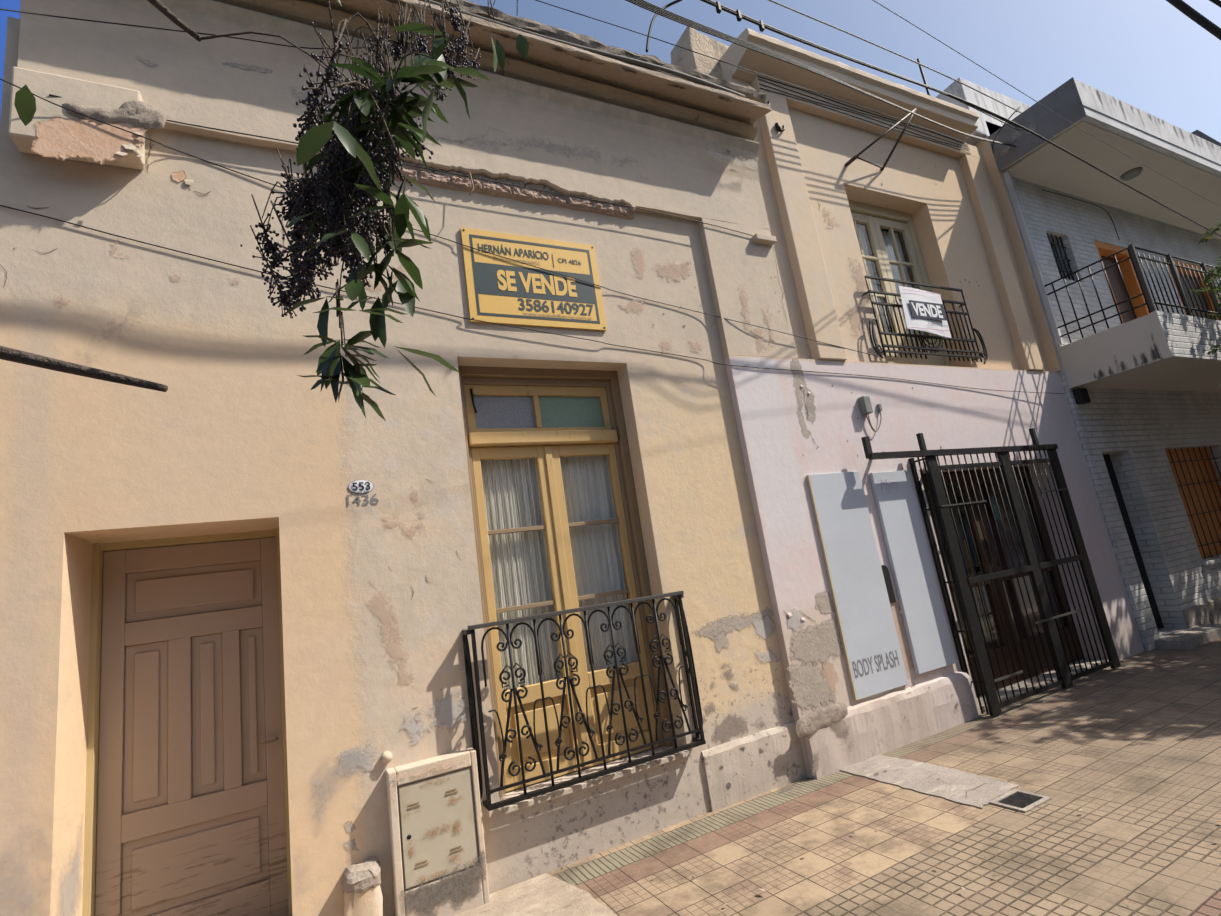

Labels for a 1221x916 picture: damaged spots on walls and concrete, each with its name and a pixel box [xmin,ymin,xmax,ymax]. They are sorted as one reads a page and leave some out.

peeling [32,100,169,164]
spalling [395,159,634,219]
peeling [790,358,816,438]
peeling [692,591,848,738]
leakage [402,850,487,916]